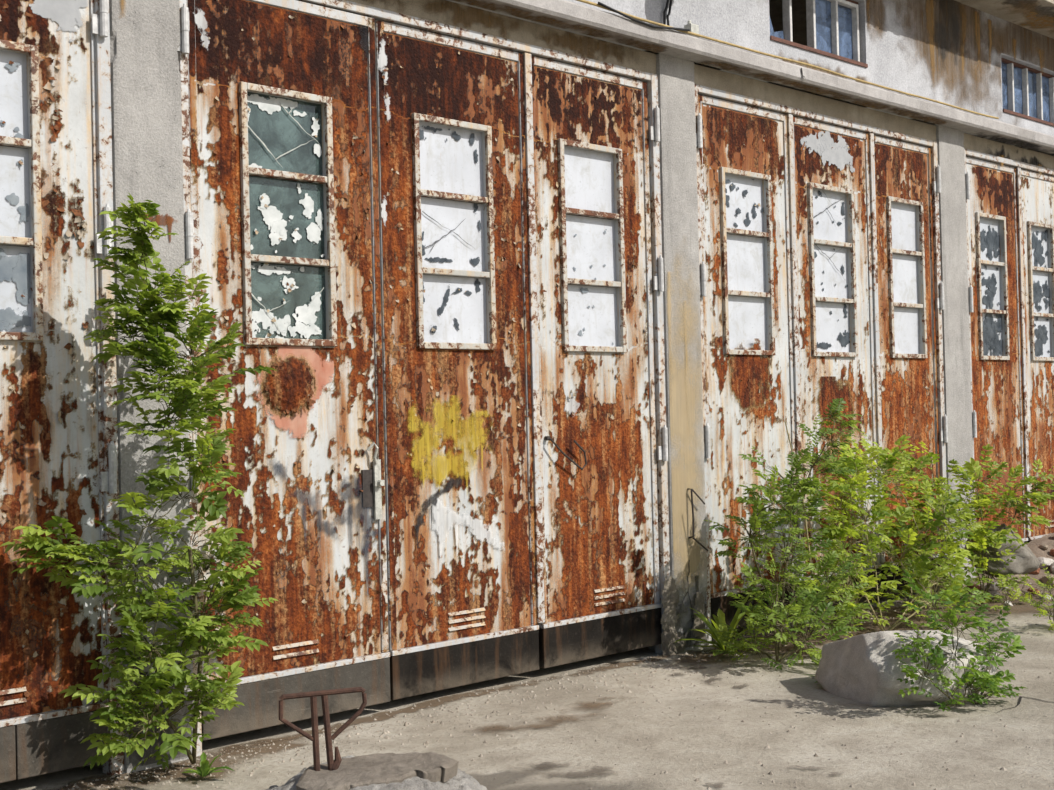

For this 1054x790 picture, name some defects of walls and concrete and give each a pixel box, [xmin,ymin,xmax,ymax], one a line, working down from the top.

peeling [195,11,211,48]
water stain [783,58,844,78]
water stain [866,0,885,33]
water stain [897,0,1054,99]
peeling [247,94,322,157]
peeling [250,183,325,257]
corrosion [0,0,107,720]
peeling [251,262,334,438]
corrosion [188,0,657,680]
peeling [565,393,580,415]
corrosion [698,94,942,594]
corrosion [969,165,1054,538]